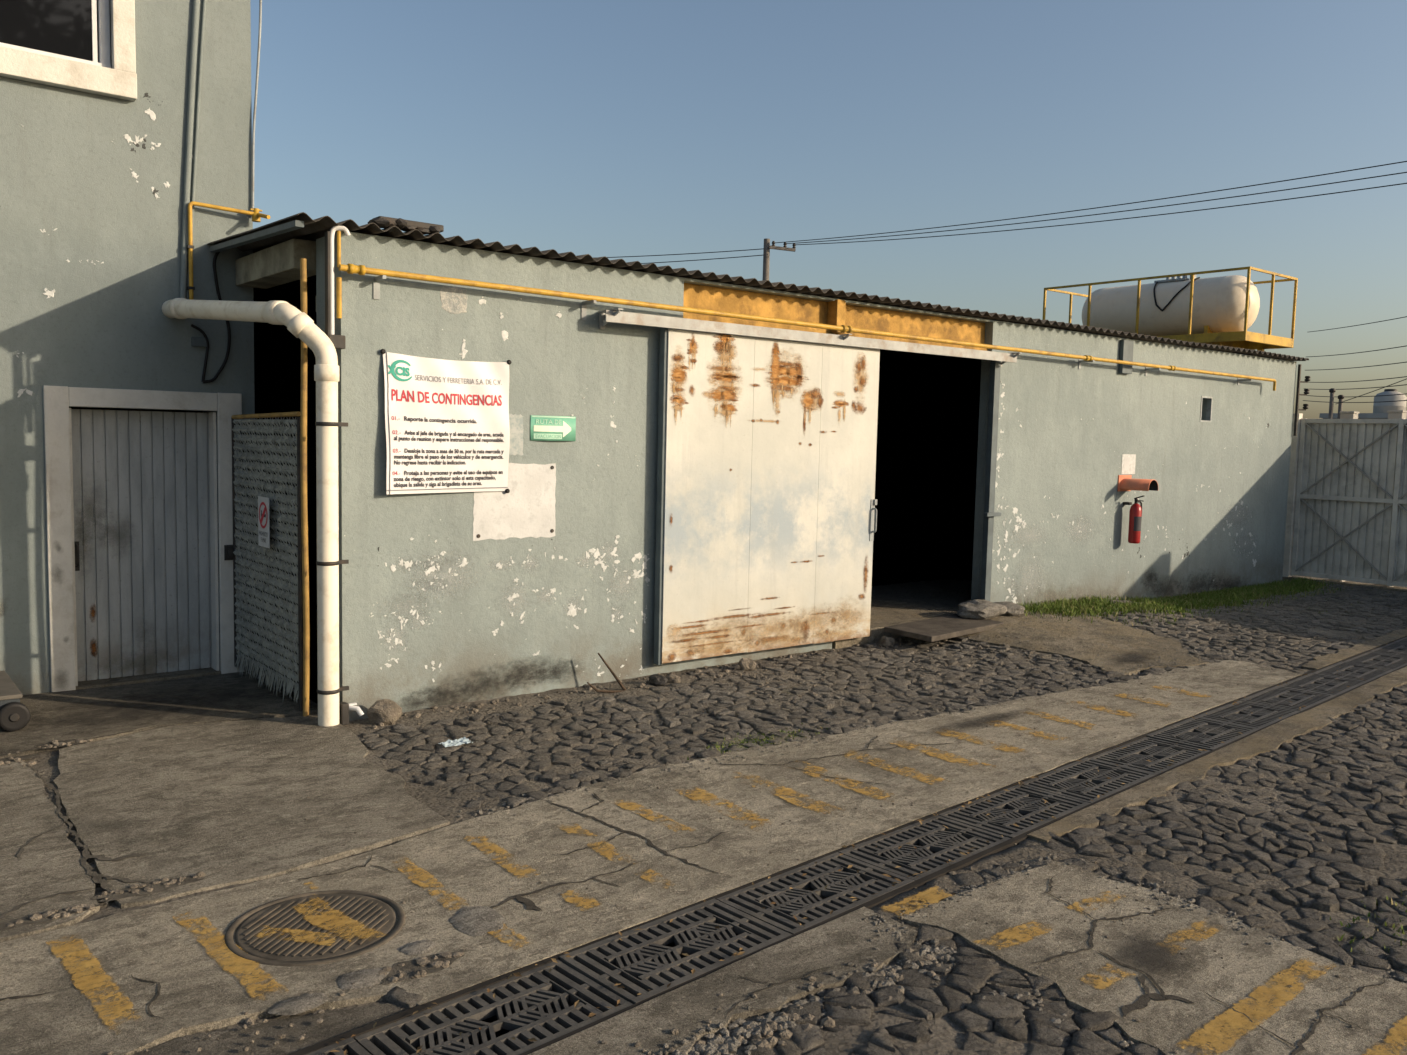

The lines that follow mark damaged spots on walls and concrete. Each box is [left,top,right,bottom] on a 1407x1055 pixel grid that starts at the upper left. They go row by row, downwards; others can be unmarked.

peeling [111,93,163,152]
peeling [130,169,170,199]
rust [671,334,866,446]
peeling [992,384,1190,604]
peeling [369,540,469,670]
peeling [488,535,650,677]
rust [669,560,868,660]
damp [412,665,565,706]
crack [0,712,310,918]
crack [490,793,731,911]
crack [1032,876,1385,1055]